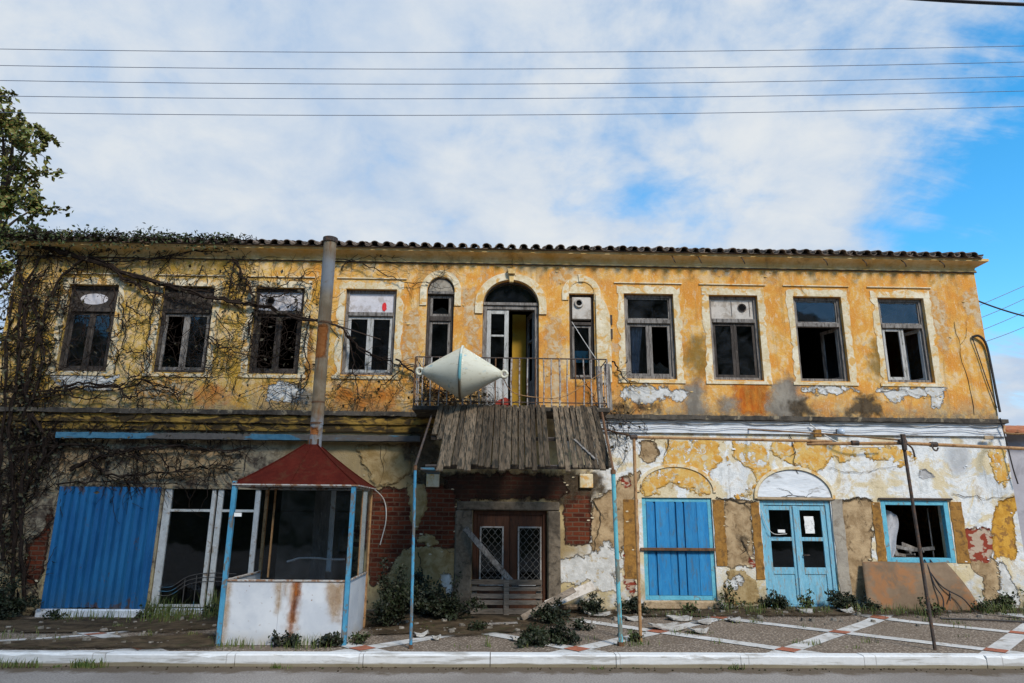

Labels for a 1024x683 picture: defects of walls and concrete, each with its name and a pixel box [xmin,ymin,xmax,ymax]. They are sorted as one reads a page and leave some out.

peeling [261,379,306,407]
peeling [612,383,693,414]
damp [765,378,814,417]
peeling [801,385,860,396]
damp [846,395,882,417]
peeling [876,386,947,409]
peeling [617,438,917,500]
flaking render [25,508,54,588]
flaking render [356,443,637,597]
peeling [965,449,1022,606]
peeling [723,536,760,607]
corrosion [289,582,300,623]